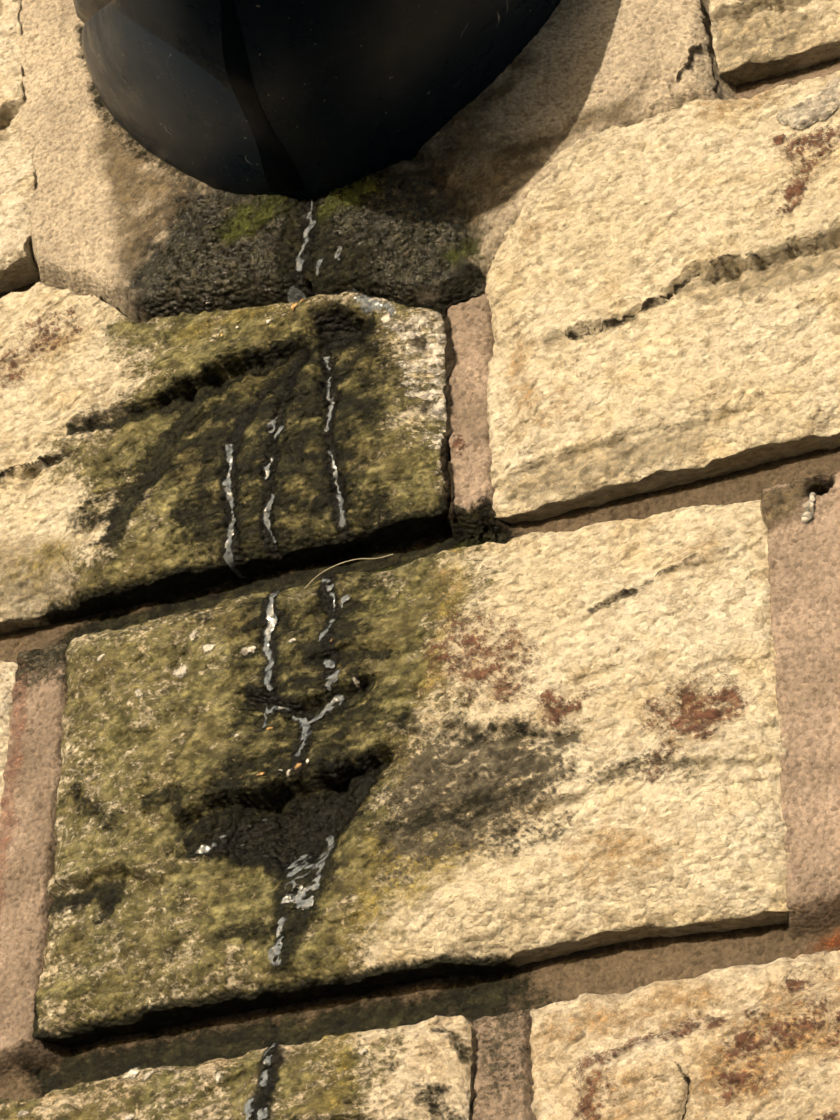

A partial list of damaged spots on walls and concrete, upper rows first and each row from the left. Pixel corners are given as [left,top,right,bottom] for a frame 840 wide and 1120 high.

crack [668,0,720,94]
water stain [244,573,350,781]
water stain [195,748,386,975]
water stain [244,1042,285,1120]
crack [675,1062,691,1120]